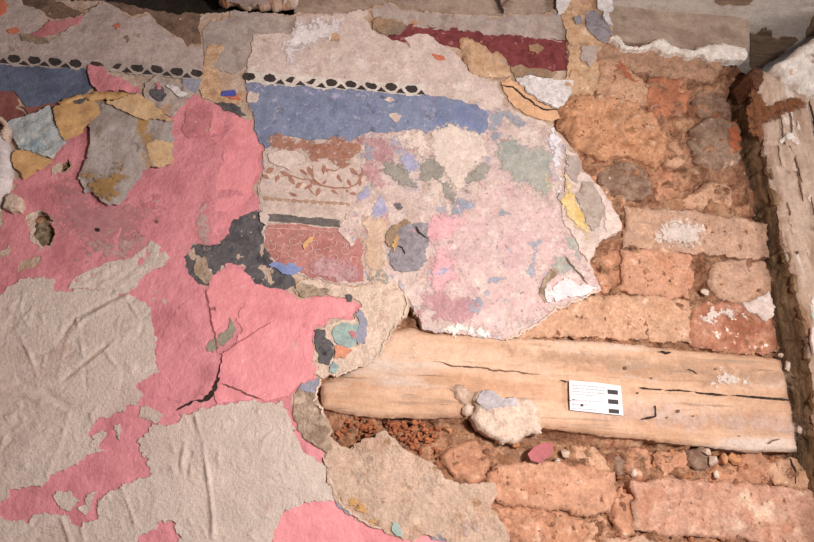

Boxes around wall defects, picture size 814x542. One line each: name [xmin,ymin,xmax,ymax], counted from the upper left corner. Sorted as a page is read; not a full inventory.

spalling [597,0,814,69]
spalling [557,149,622,262]
efflorescence [651,218,706,248]
peeling [0,0,574,542]
spalling [538,268,596,303]
efflorescence [703,305,752,323]
crack [176,290,271,411]